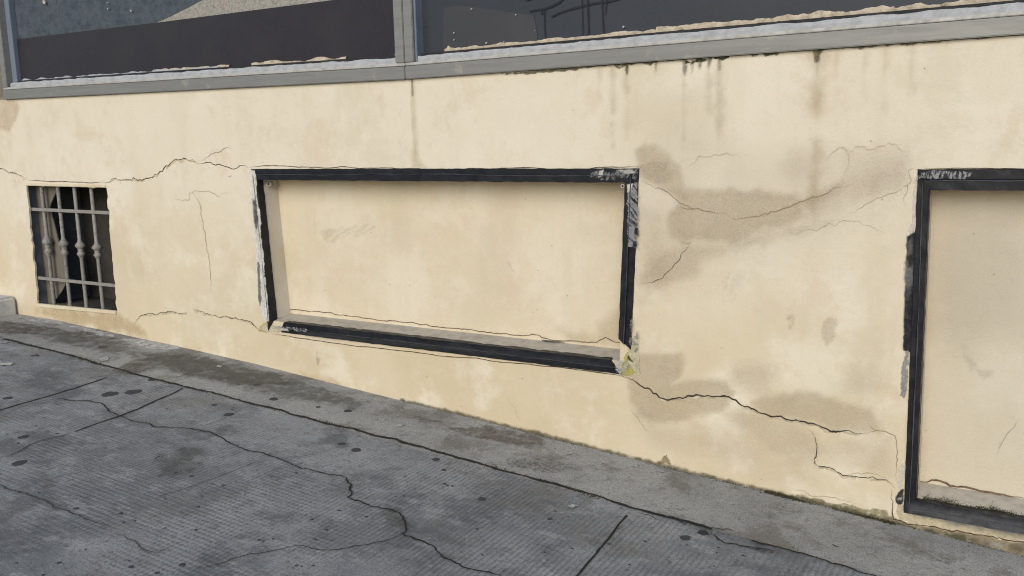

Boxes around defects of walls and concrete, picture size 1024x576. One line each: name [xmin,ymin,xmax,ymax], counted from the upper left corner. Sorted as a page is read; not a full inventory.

crack [0,124,421,280]
crack [465,164,546,172]
crack [589,166,1023,233]
spalling [615,319,640,375]
damp [620,352,635,376]
crack [138,309,1024,542]